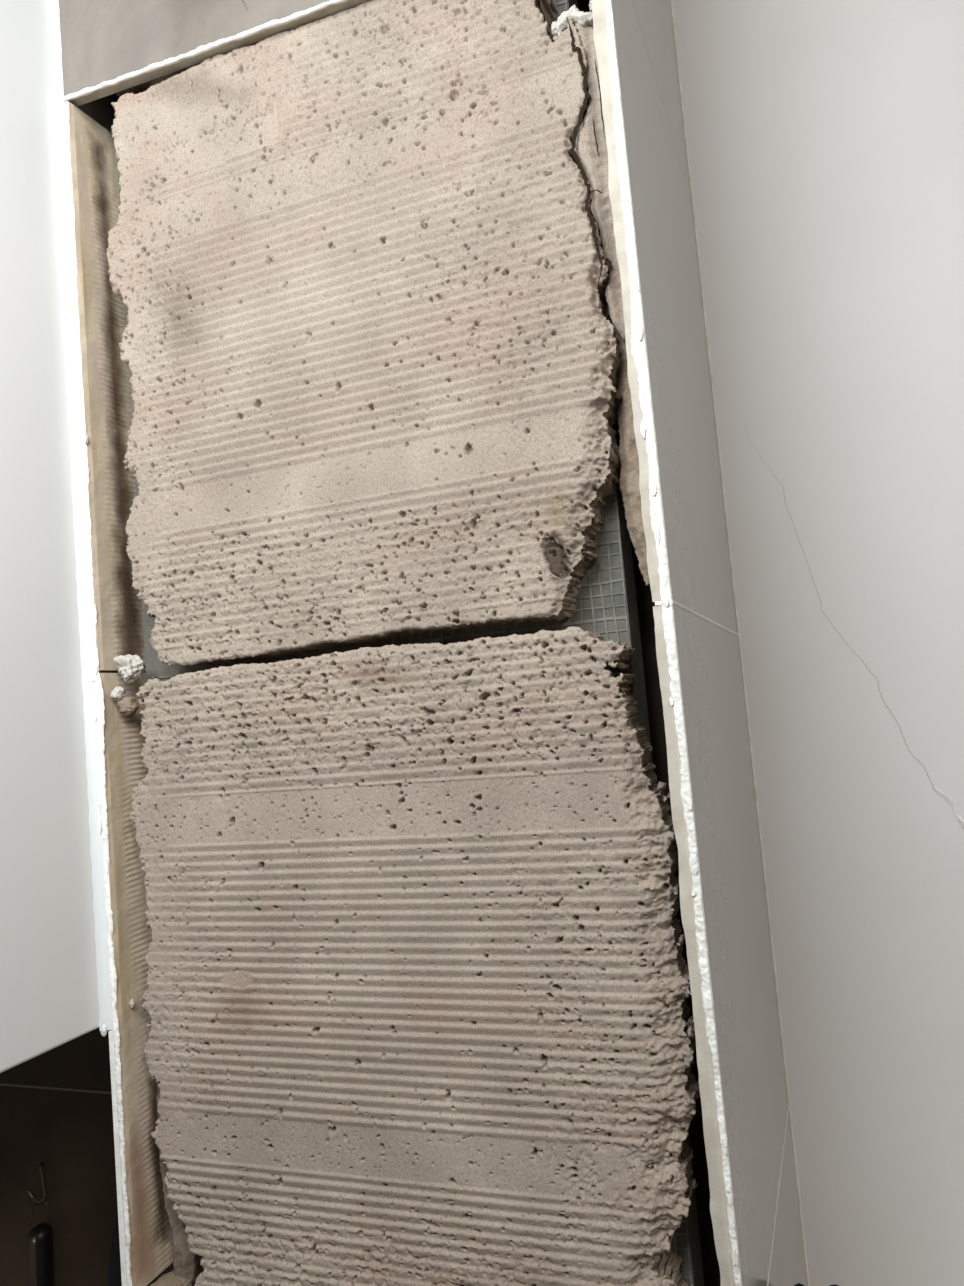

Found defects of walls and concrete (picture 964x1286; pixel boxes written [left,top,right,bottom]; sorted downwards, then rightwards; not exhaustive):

spalling [545,532,566,579]
spalling [605,0,742,1286]
crack [743,424,964,829]